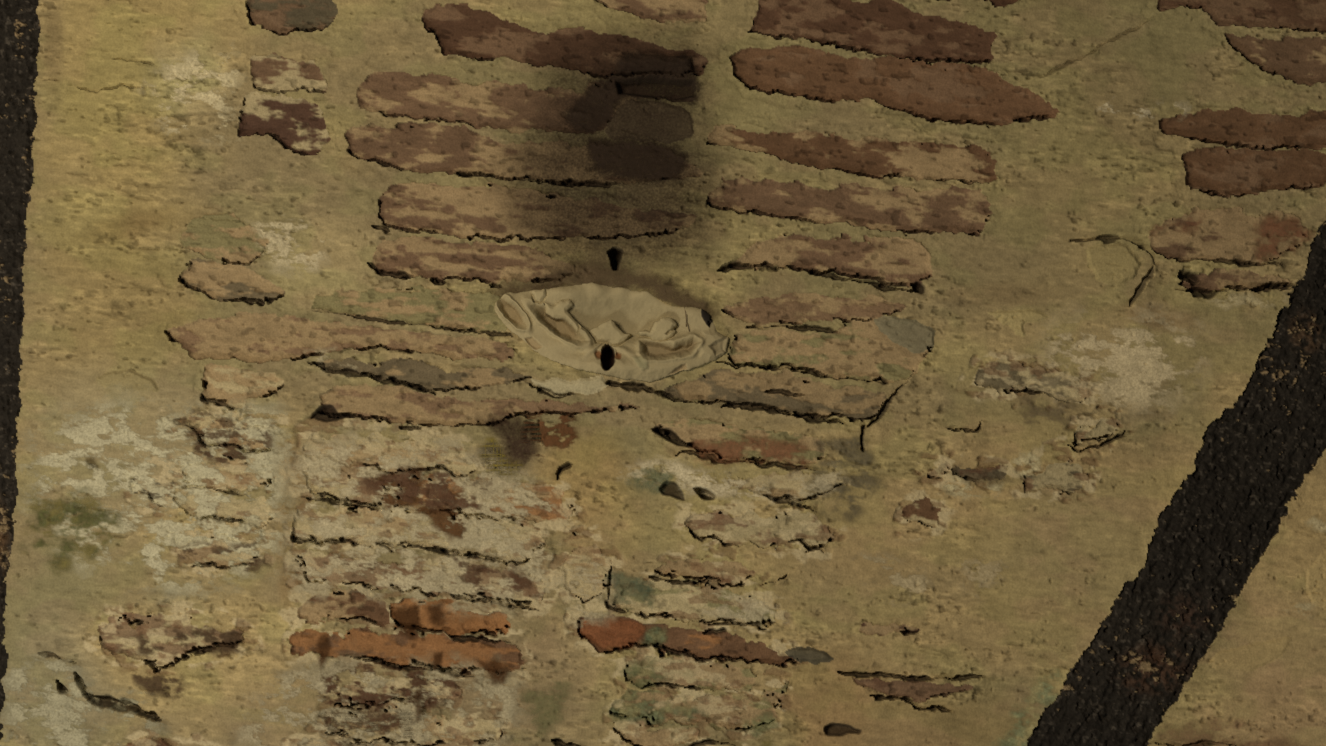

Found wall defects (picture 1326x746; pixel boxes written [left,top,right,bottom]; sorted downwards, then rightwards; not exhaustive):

spalling [102,0,1074,746]
spalling [892,348,1139,541]
spalling [81,598,266,678]